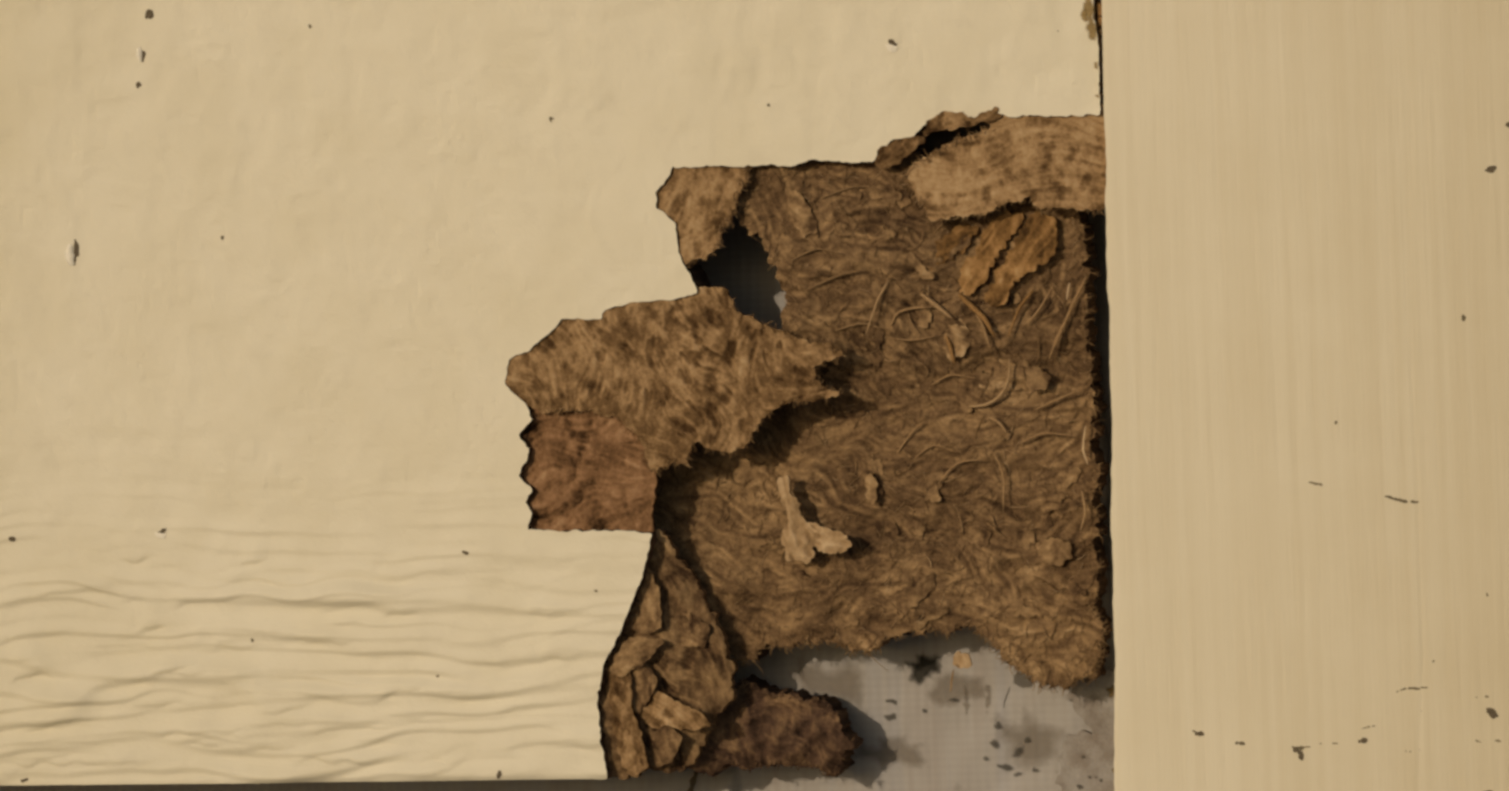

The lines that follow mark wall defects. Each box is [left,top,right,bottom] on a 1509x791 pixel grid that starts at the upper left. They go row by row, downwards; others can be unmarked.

peeling [875,107,1002,169]
peeling [785,188,819,238]
peeling [929,210,1058,307]
peeling [942,318,973,361]
peeling [1025,366,1052,391]
peeling [865,473,879,504]
peeling [1036,537,1073,566]
peeling [609,568,712,777]